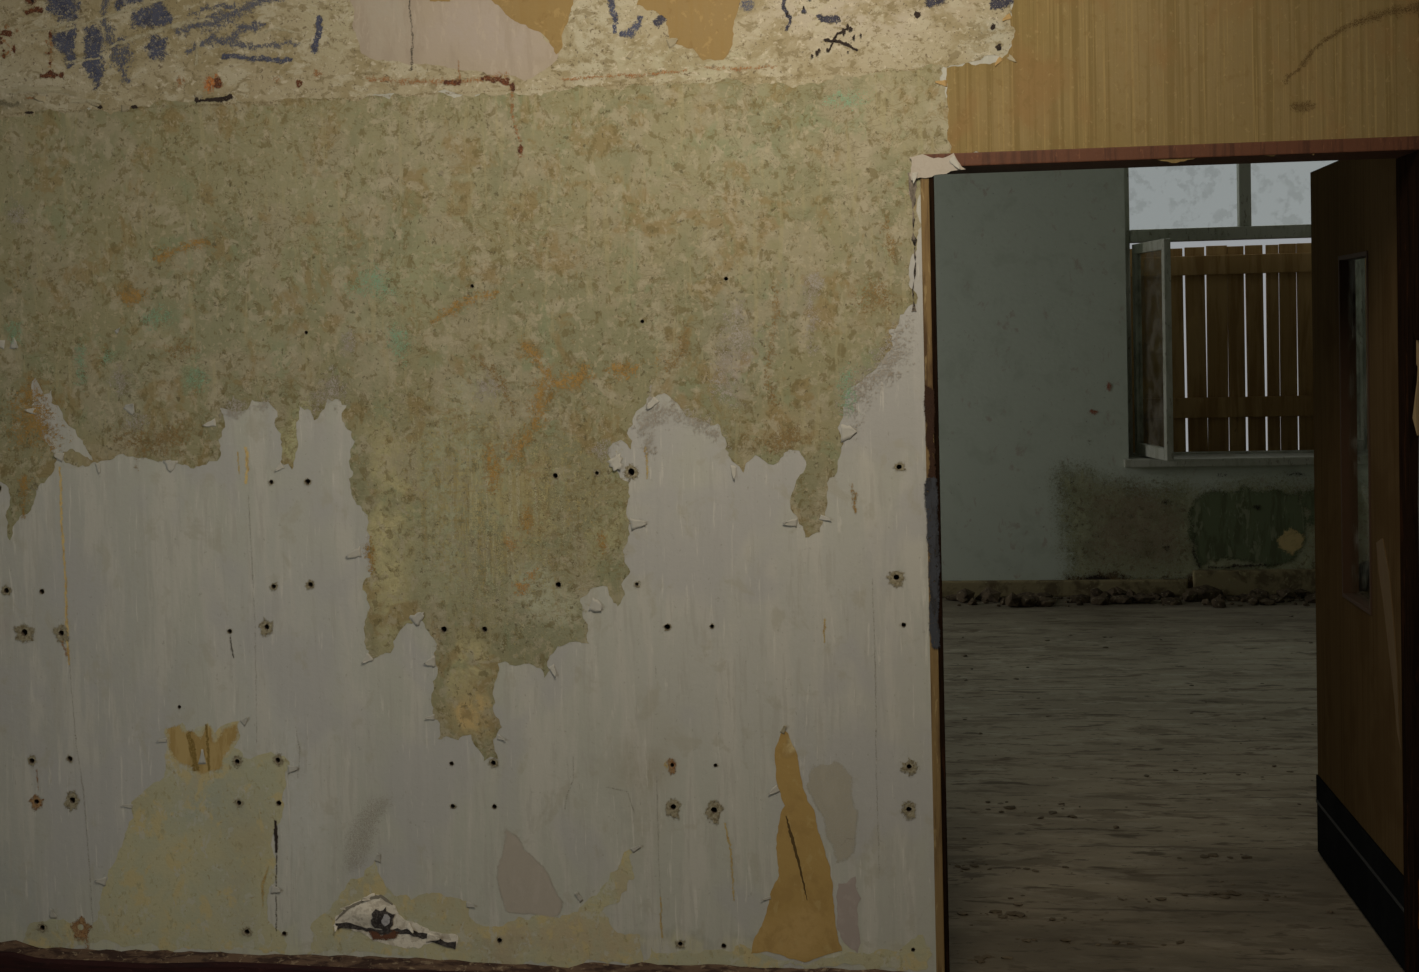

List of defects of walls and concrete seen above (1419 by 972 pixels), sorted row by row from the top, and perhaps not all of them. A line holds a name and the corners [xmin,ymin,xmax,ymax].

peeling [0,0,1016,770]
peeling [23,717,298,954]
peeling [307,725,932,971]